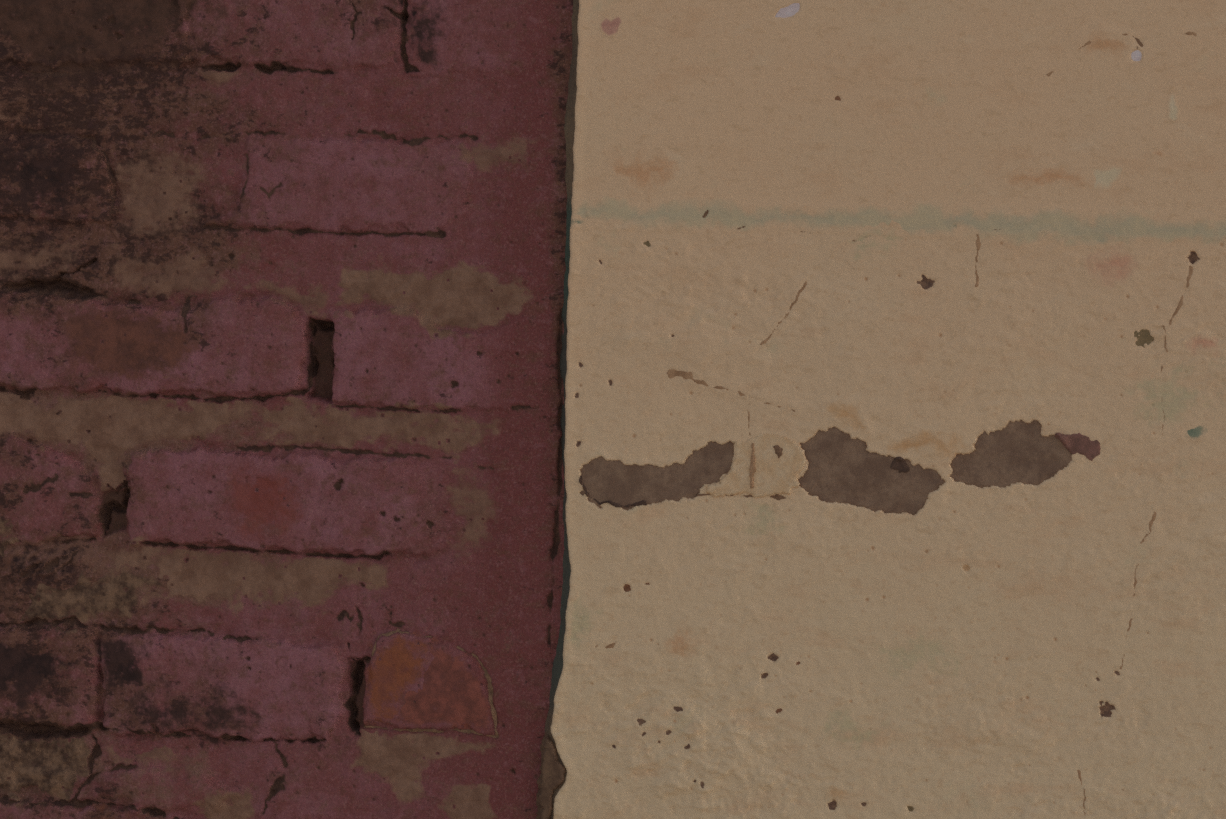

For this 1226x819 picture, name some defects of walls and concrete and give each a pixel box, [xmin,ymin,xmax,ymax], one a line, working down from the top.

peeling [536,0,1101,819]